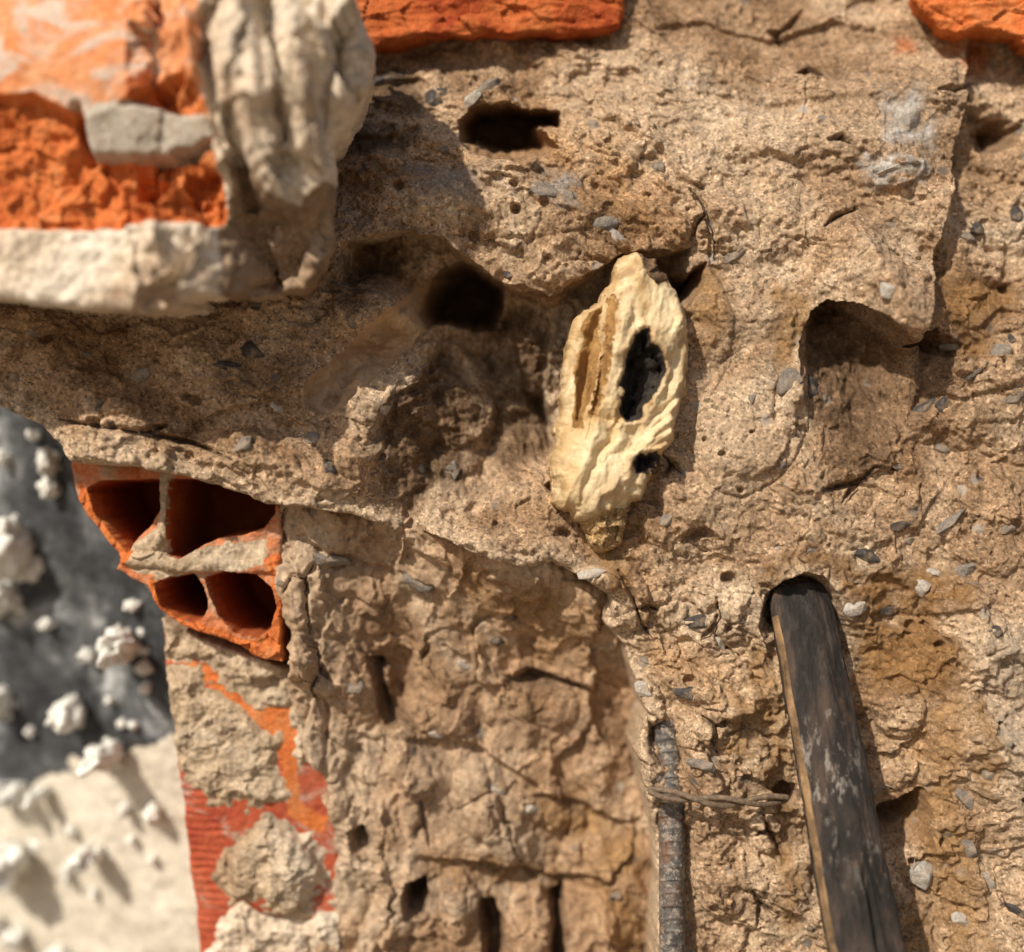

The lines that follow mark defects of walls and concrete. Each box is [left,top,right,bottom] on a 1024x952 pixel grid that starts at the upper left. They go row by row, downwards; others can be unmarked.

crack [768,12,802,47]
crack [60,419,229,459]
peeling [0,406,293,815]